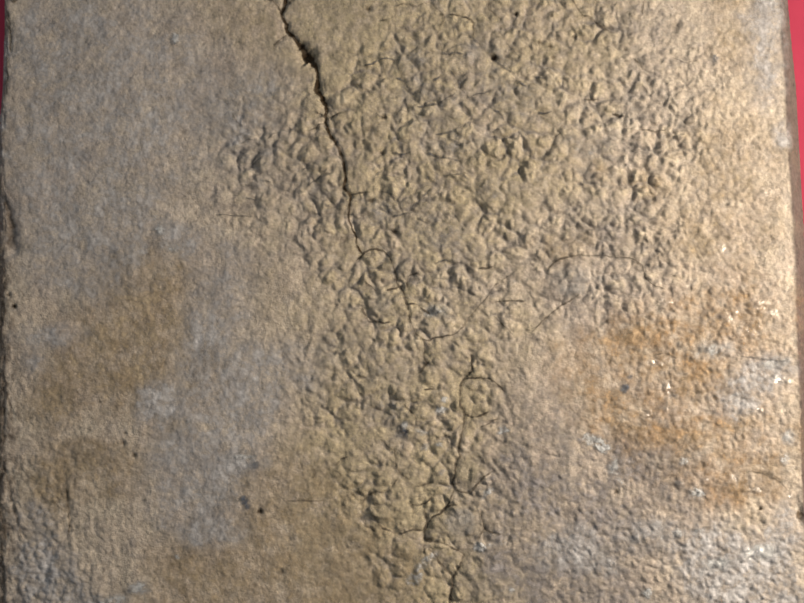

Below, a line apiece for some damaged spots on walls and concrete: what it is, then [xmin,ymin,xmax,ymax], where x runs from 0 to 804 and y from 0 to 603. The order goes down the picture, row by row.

crack [365,13,503,123]
crack [494,48,545,86]
crack [271,0,468,390]
crack [353,359,504,603]